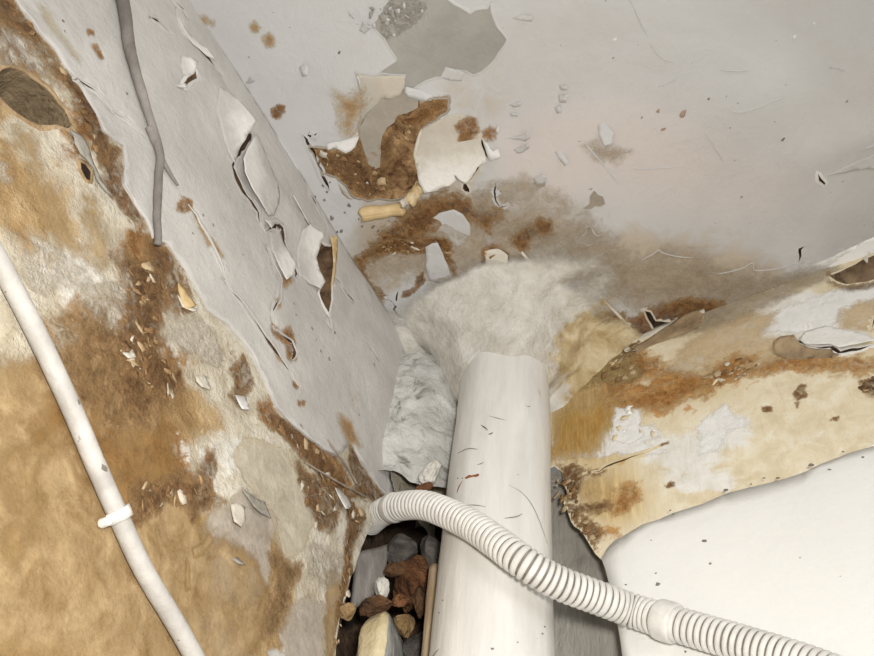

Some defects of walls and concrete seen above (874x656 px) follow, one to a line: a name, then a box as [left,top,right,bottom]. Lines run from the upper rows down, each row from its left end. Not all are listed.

damp [0,4,69,85]
spalling [307,0,508,203]
peeling [217,86,338,294]
spalling [372,209,471,284]
spalling [481,245,508,265]
peeling [813,237,874,268]
peeling [773,326,874,360]
damp [0,187,270,656]
damp [551,378,616,459]
spalling [610,405,656,444]
spalling [858,376,874,396]
damp [308,543,349,656]